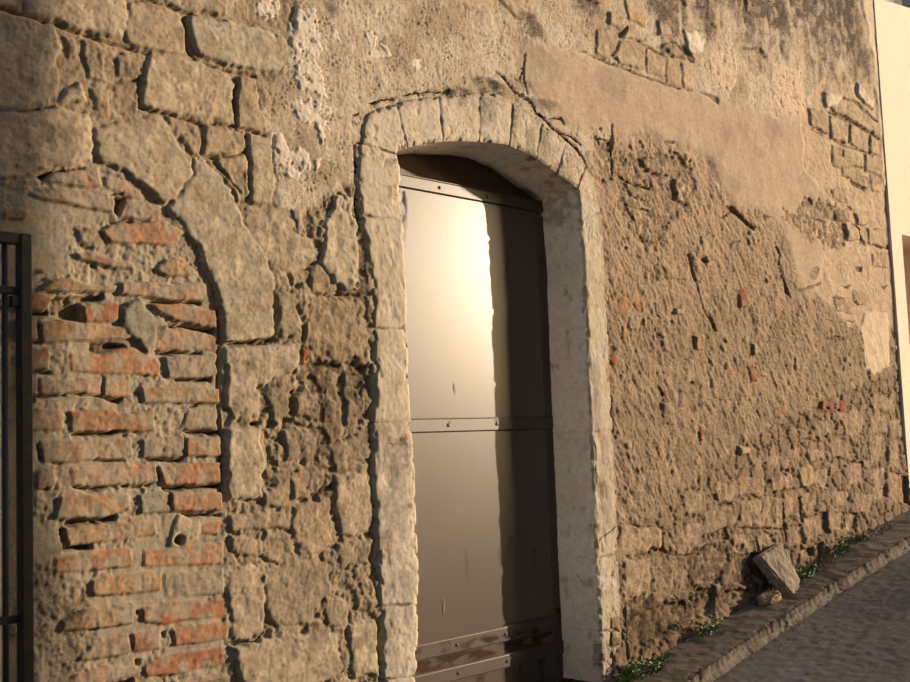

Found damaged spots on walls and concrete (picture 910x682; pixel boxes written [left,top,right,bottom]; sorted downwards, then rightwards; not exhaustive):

water stain [647,0,871,89]
crack [498,73,644,189]
spalling [788,200,846,245]
rust [415,628,552,673]